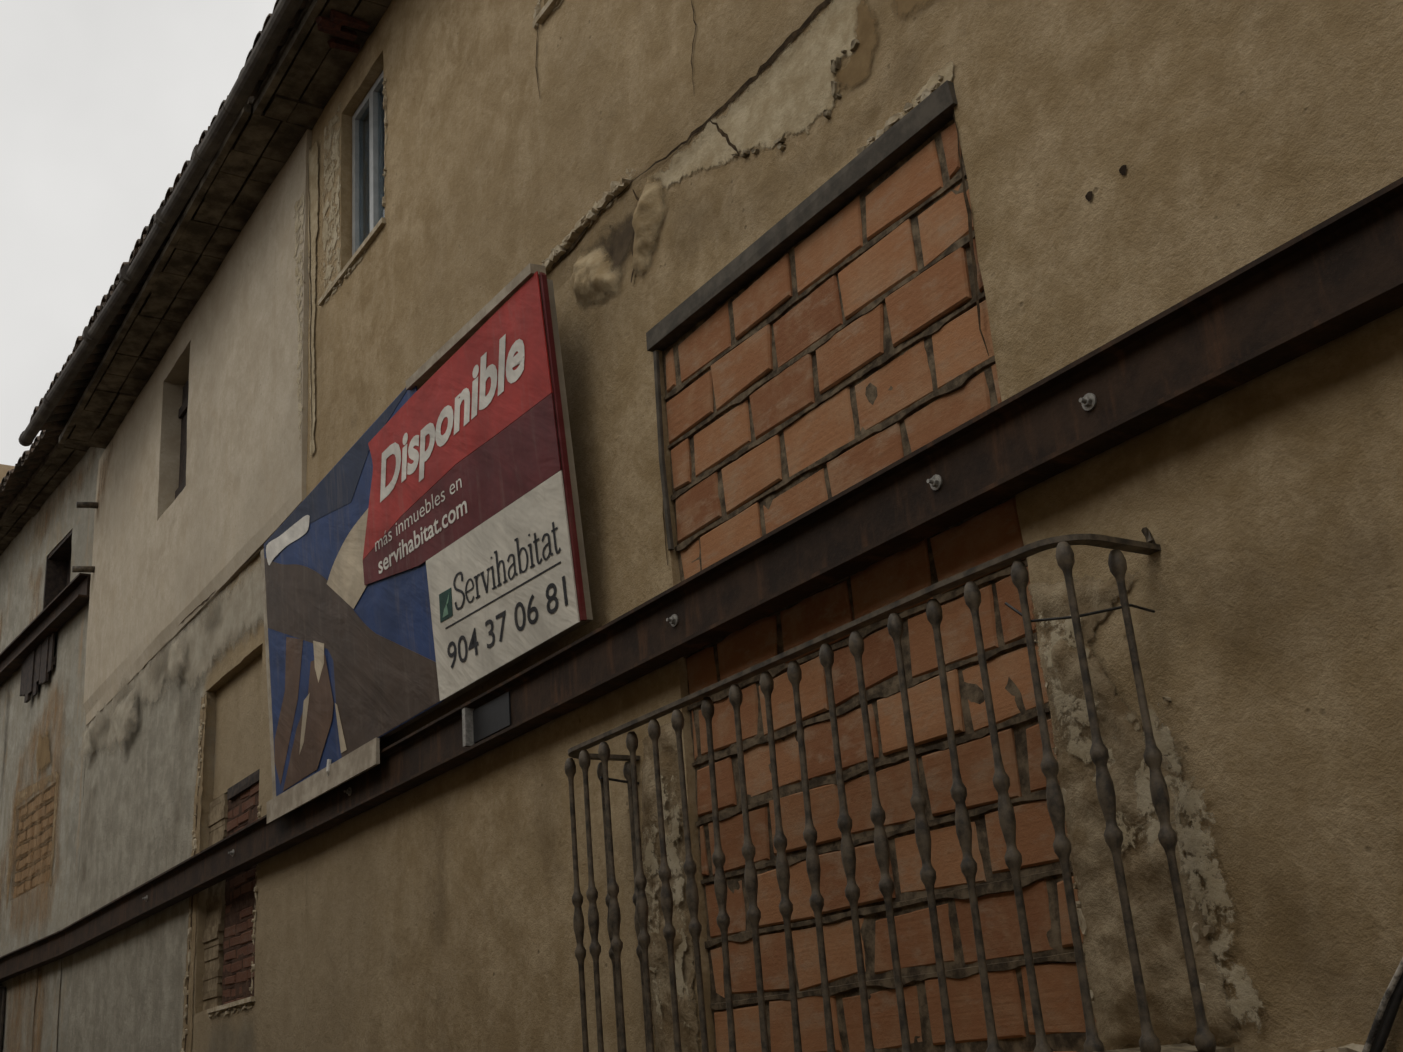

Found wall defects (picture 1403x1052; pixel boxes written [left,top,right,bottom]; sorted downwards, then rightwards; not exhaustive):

crack [551,0,831,282]
peeling [542,0,860,274]
spalling [856,61,953,154]
peeling [1028,573,1264,1050]